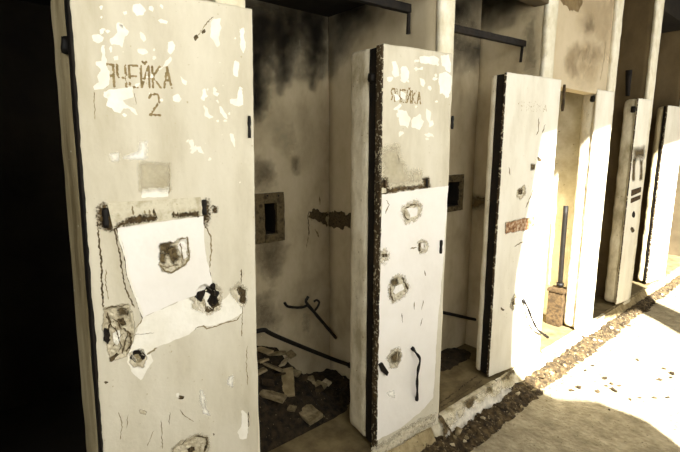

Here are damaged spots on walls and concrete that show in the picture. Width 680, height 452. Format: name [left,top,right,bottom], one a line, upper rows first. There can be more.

peeling [92,22,140,117]
water stain [245,0,371,115]
peeling [387,54,452,102]
peeling [394,91,434,140]
peeling [141,186,169,198]
spalling [308,208,351,230]
spalling [401,201,422,225]
spalling [159,237,190,274]
spalling [411,240,428,254]
spalling [388,274,409,304]
peeling [102,269,246,380]
spalling [387,348,402,369]